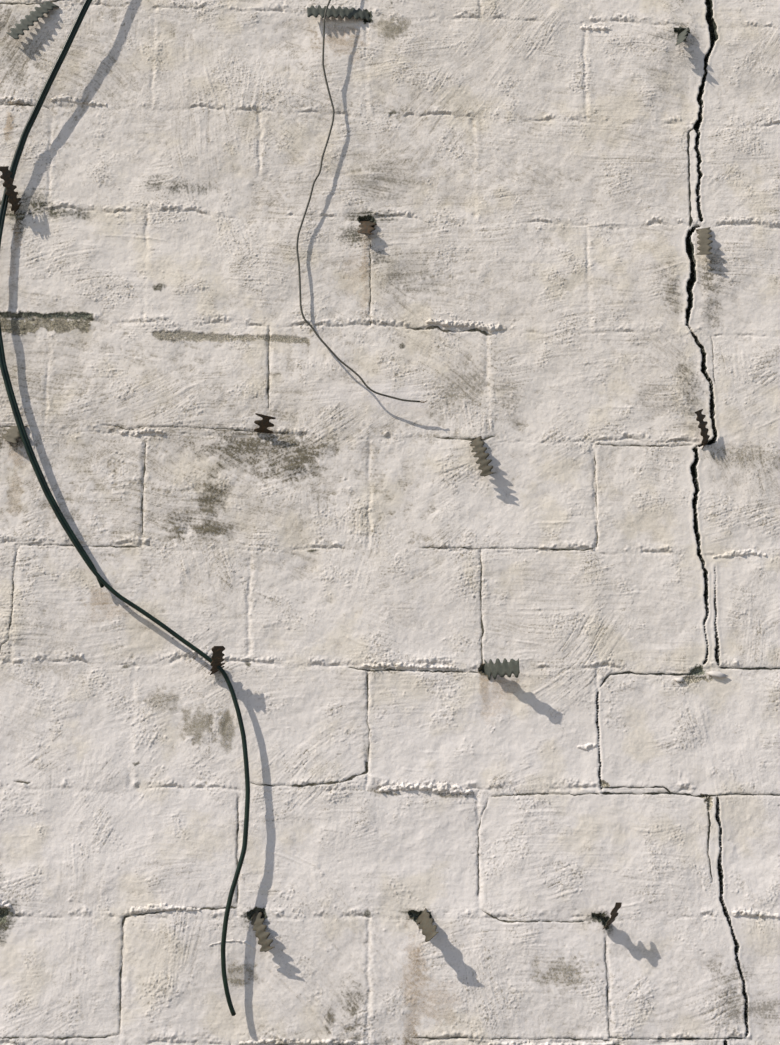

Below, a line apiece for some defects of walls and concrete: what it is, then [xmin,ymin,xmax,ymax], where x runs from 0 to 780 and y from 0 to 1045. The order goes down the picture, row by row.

damp [164,430,338,540]
crack [253,0,780,1045]